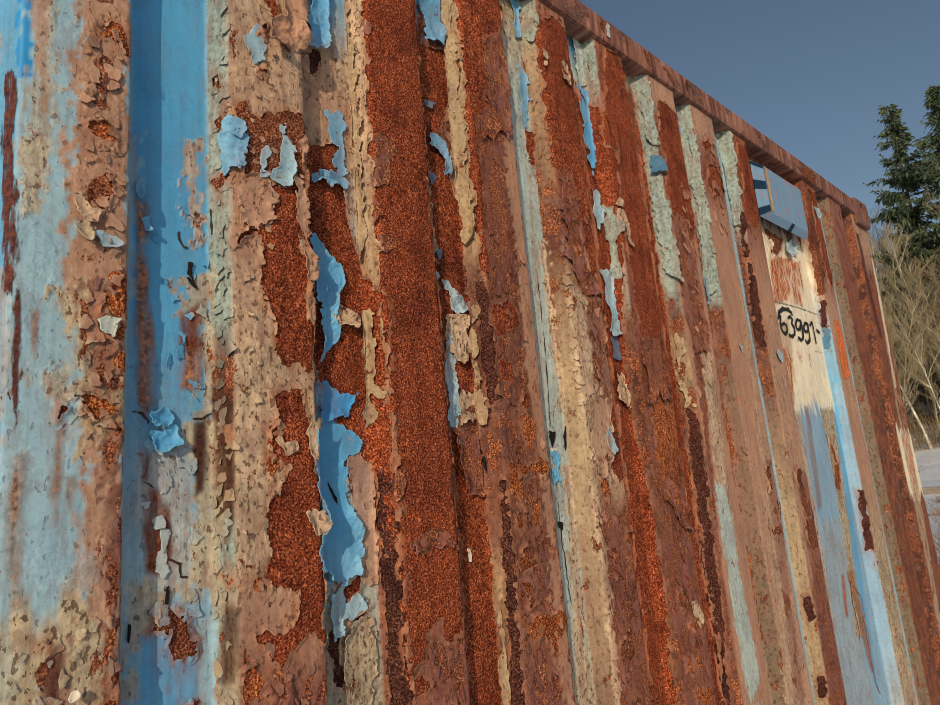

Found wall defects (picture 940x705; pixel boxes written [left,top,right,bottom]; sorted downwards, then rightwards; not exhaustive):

corrosion [0,69,26,434]
peeling [93,403,122,429]
peeling [73,18,146,396]
peeling [140,216,277,628]
corrosion [194,390,233,529]
peeling [211,0,399,705]
corrosion [208,0,568,705]
peeling [393,468,407,502]
corrosion [520,13,737,705]
corrosion [735,140,849,379]
corrosion [825,425,841,492]
corrosion [854,486,874,555]